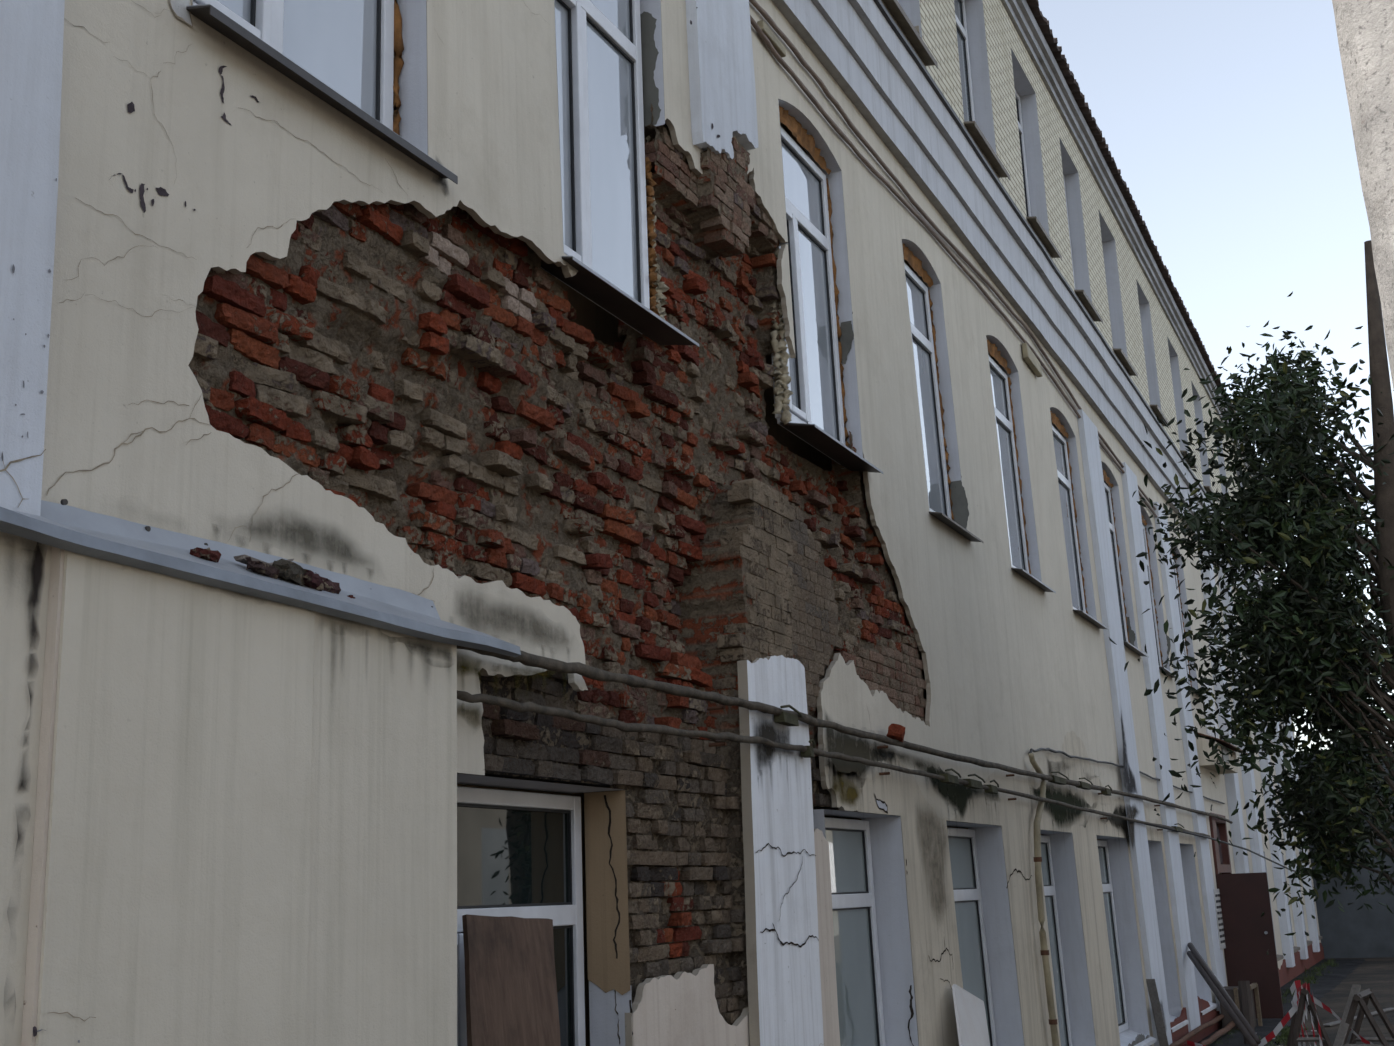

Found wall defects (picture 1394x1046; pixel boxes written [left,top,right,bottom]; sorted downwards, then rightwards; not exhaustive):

crack [67,20,190,183]
spalling [110,173,169,213]
crack [59,198,197,317]
crack [0,394,210,507]
water stain [29,542,44,706]
spalling [188,104,926,1043]
water stain [826,718,998,816]
water stain [1033,761,1089,826]
water stain [1106,716,1138,847]
crack [756,843,819,948]
crack [908,940,953,1046]